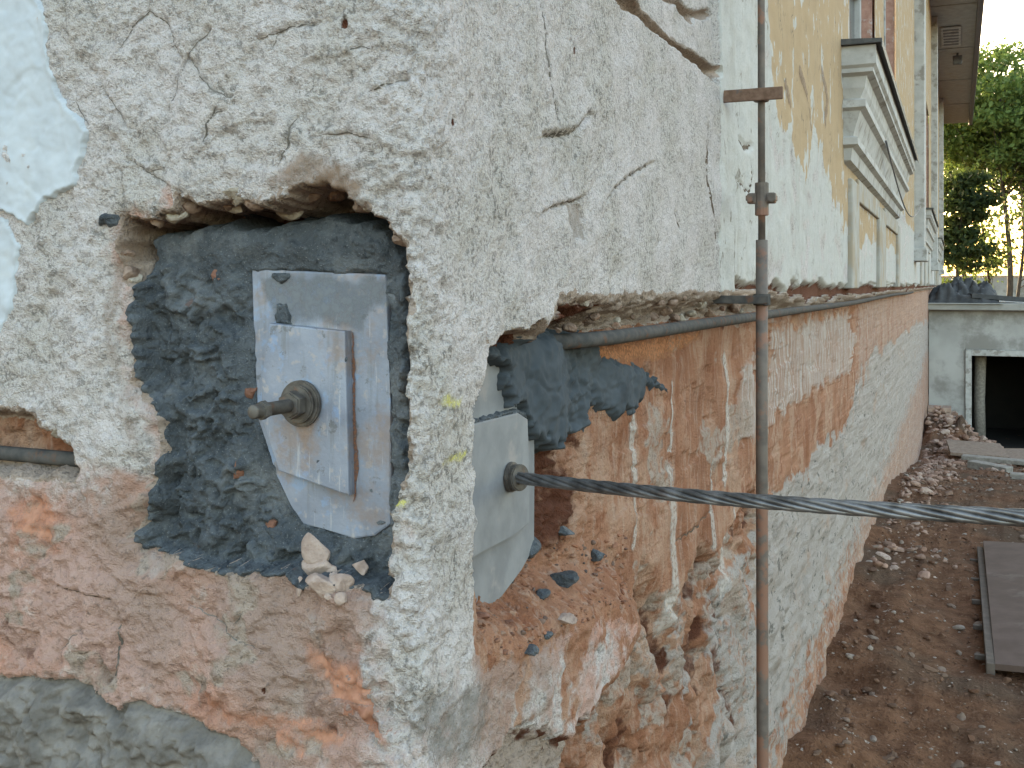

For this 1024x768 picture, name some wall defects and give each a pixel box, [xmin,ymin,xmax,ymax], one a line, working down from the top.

peeling [0,0,89,332]
crack [117,11,226,142]
crack [260,23,317,50]
crack [540,5,582,138]
crack [705,145,716,239]
peeling [765,0,853,247]
spalling [115,178,415,600]
flaking render [471,287,893,451]
damp [710,356,730,491]
damp [655,501,679,636]
damp [709,505,729,597]
spalling [482,507,756,768]